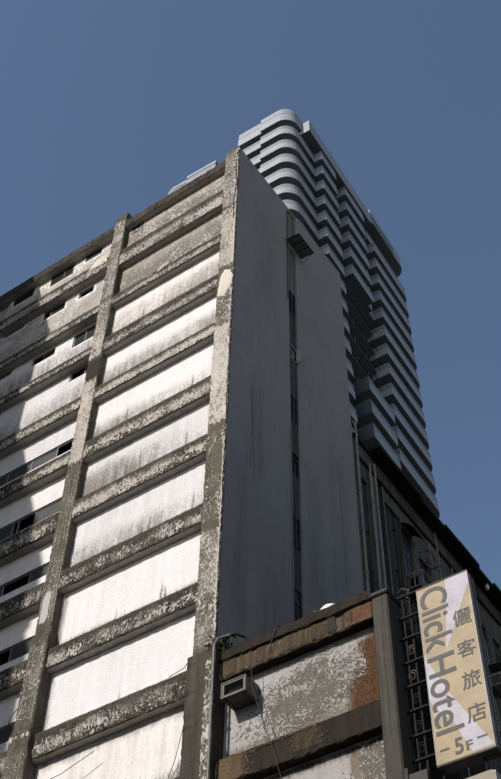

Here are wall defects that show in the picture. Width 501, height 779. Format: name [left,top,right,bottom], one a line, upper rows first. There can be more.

damp [61,500,201,577]
damp [220,616,336,677]
corrosion [347,632,380,710]
peeling [0,680,186,779]
peeling [199,644,367,779]
peeling [343,736,386,779]